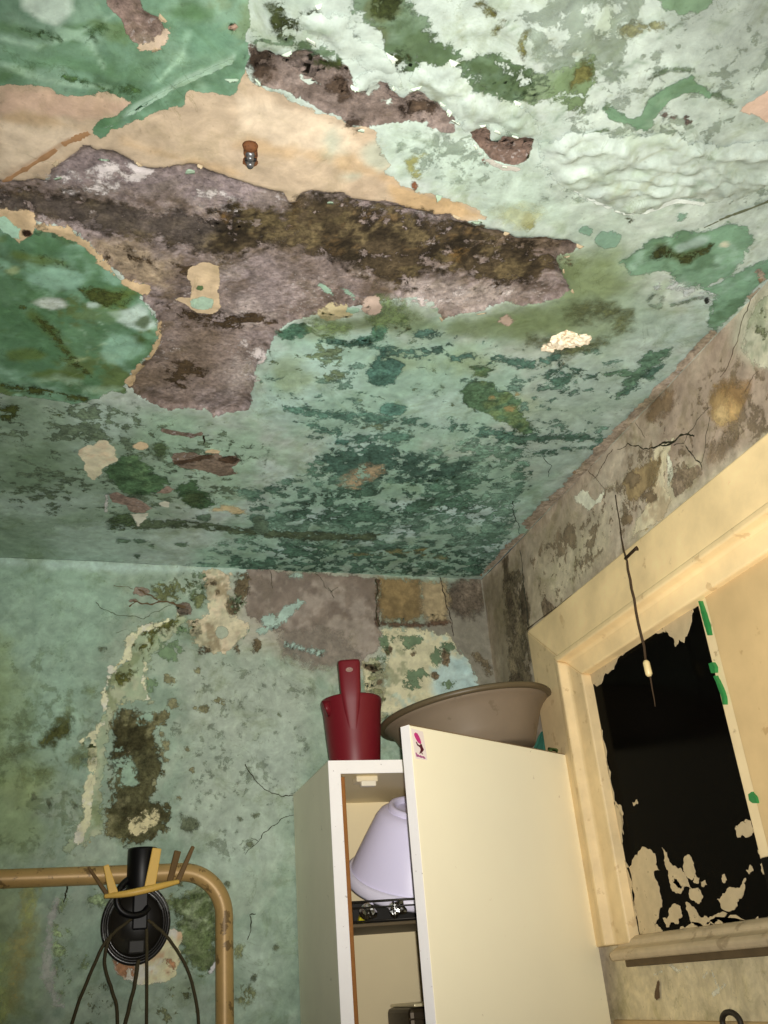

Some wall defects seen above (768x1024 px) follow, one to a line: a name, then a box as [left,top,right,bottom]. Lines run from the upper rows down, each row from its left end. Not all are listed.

spalling [106,0,170,52]
spalling [0,44,584,418]
crack [720,300,751,377]
peeling [171,449,241,477]
damp [0,294,768,682]
crack [588,407,710,486]
damp [193,697,225,713]
peeling [63,568,478,853]
damp [104,698,199,848]